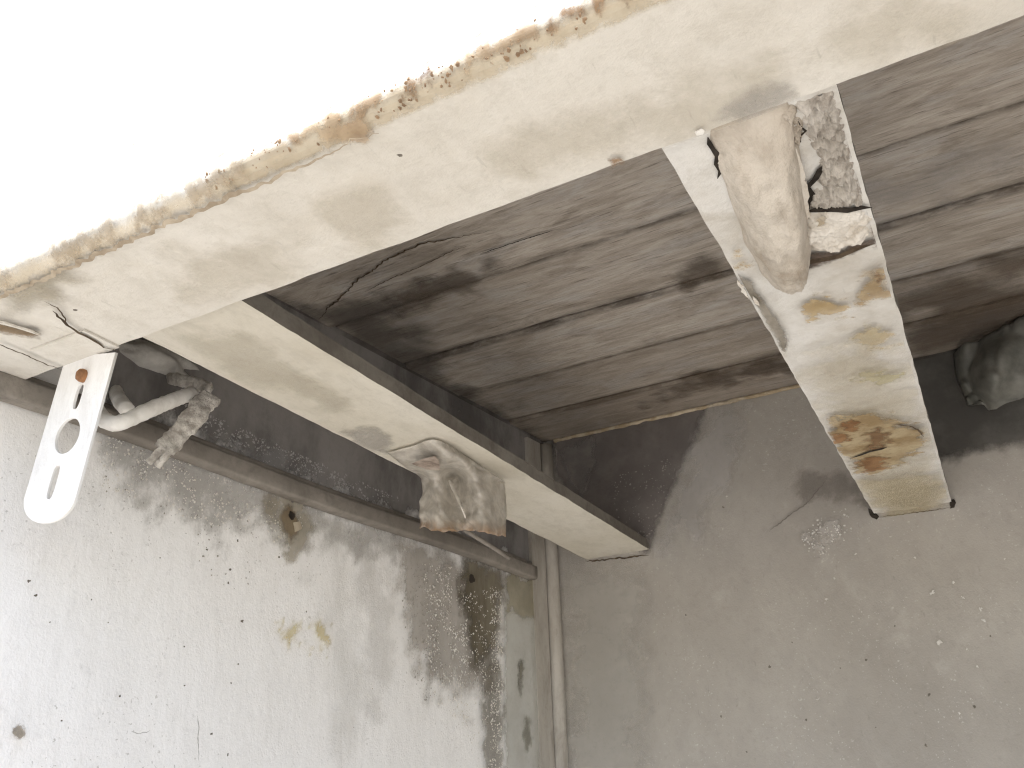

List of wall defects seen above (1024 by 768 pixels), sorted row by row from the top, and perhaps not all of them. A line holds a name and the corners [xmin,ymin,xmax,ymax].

crack [707,137,721,179]
spalling [782,91,876,269]
crack [807,166,872,213]
crack [46,302,118,352]
crack [320,230,552,318]
rust [801,268,891,323]
water stain [106,348,184,408]
water stain [261,292,544,461]
water stain [181,356,423,514]
peeling [387,439,507,537]
rust [828,413,927,475]
water stain [402,544,506,768]